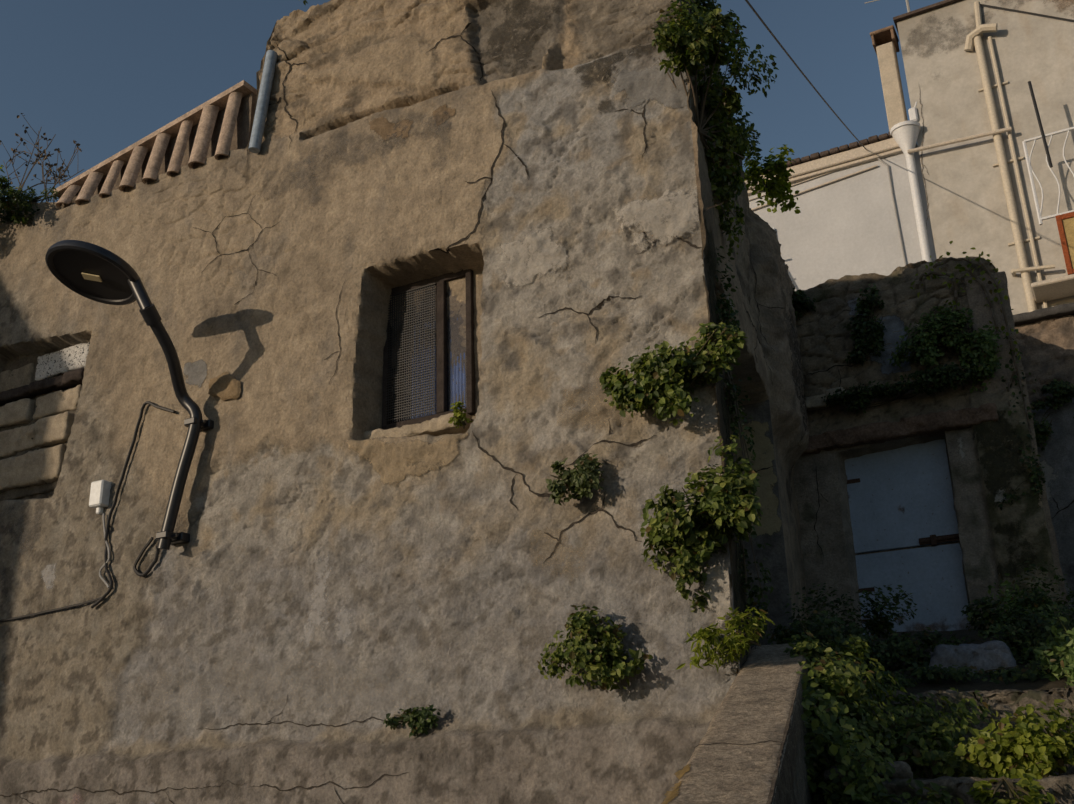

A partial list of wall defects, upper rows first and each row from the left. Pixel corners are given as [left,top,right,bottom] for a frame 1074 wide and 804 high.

crack [426,22,529,254]
crack [472,420,657,562]